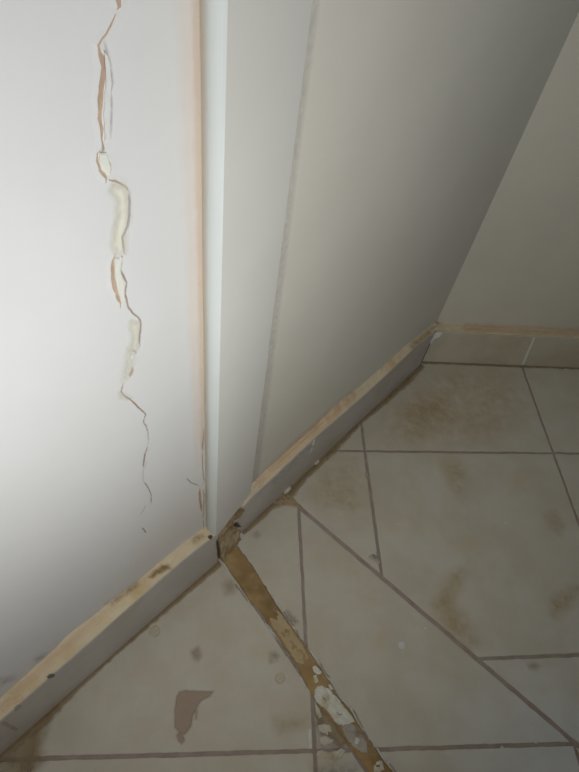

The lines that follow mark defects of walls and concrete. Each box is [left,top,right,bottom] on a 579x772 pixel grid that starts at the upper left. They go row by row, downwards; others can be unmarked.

crack [90,0,150,422]
crack [142,445,152,500]
spalling [223,564,396,772]